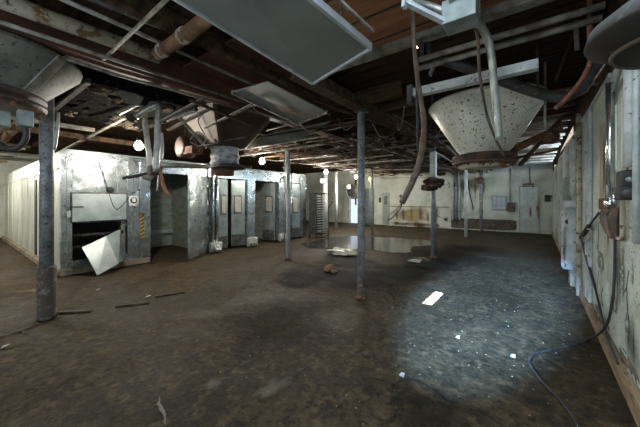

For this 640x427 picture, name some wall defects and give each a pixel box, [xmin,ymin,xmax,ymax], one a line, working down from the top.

water stain [396,208,438,222]